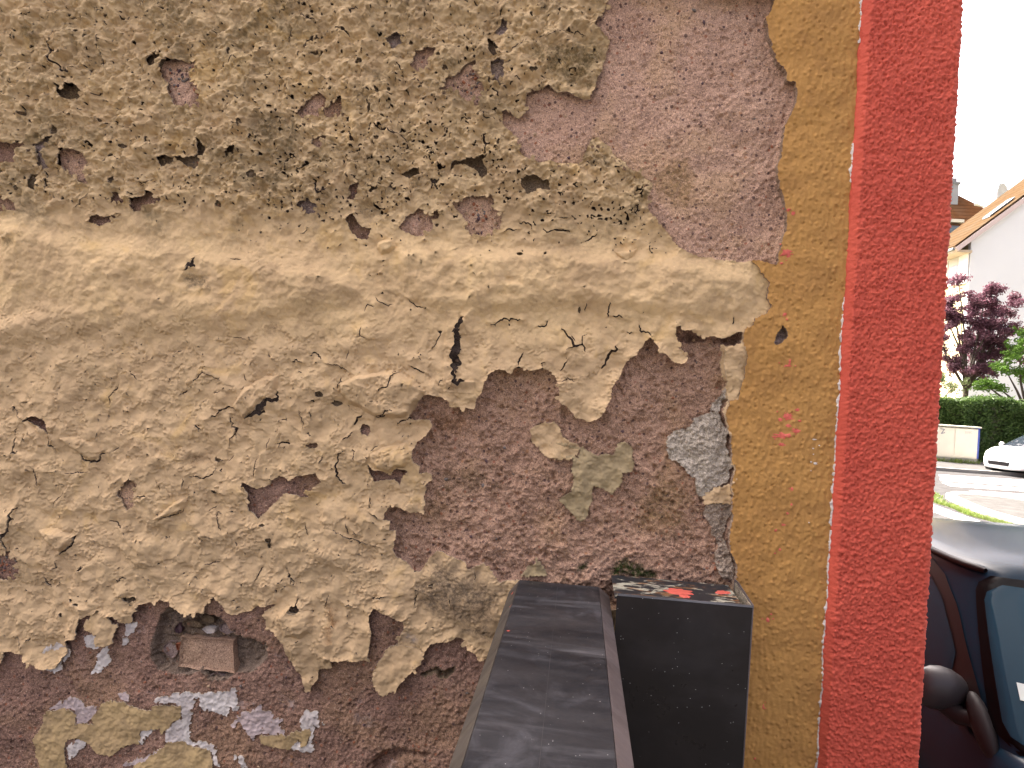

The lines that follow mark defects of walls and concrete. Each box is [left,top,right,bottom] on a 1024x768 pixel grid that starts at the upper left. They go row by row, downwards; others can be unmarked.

peeling [0,125,88,211]
peeling [53,75,86,104]
peeling [84,177,168,226]
peeling [158,140,242,175]
peeling [346,167,439,241]
peeling [392,193,503,243]
peeling [384,17,517,113]
peeling [451,0,795,264]
crack [490,303,652,382]
crack [319,316,464,484]
peeling [368,326,742,610]
peeling [0,597,486,768]